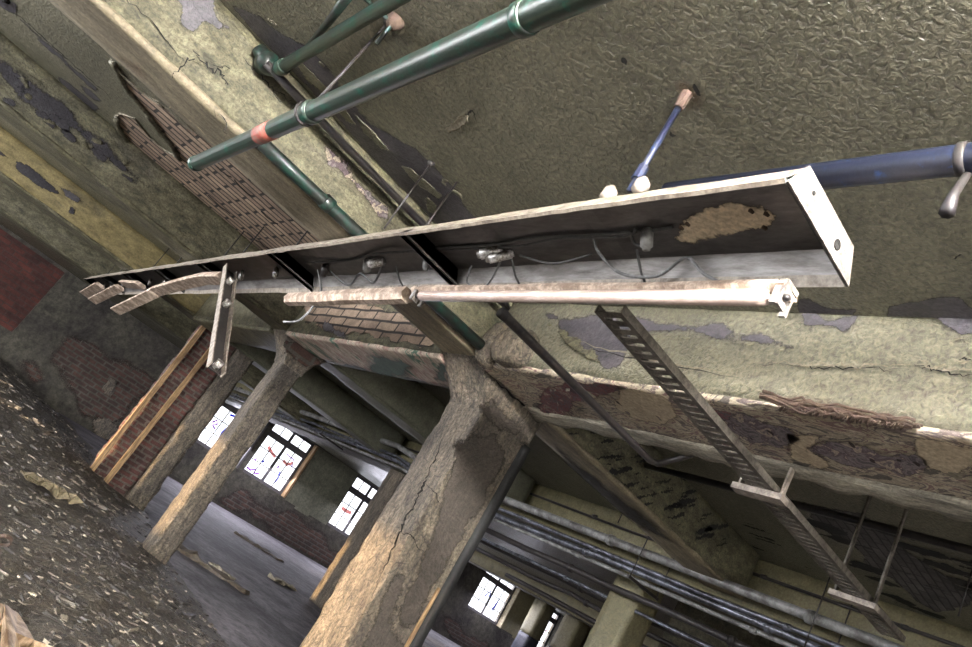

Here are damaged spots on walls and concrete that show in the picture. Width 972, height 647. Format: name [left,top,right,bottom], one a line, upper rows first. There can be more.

peeling [178,0,229,32]
peeling [233,6,305,59]
peeling [292,56,343,97]
peeling [0,60,144,185]
peeling [15,161,80,214]
spalling [109,59,320,251]
peeling [325,107,476,224]
peeling [887,297,972,340]
crack [372,436,442,596]